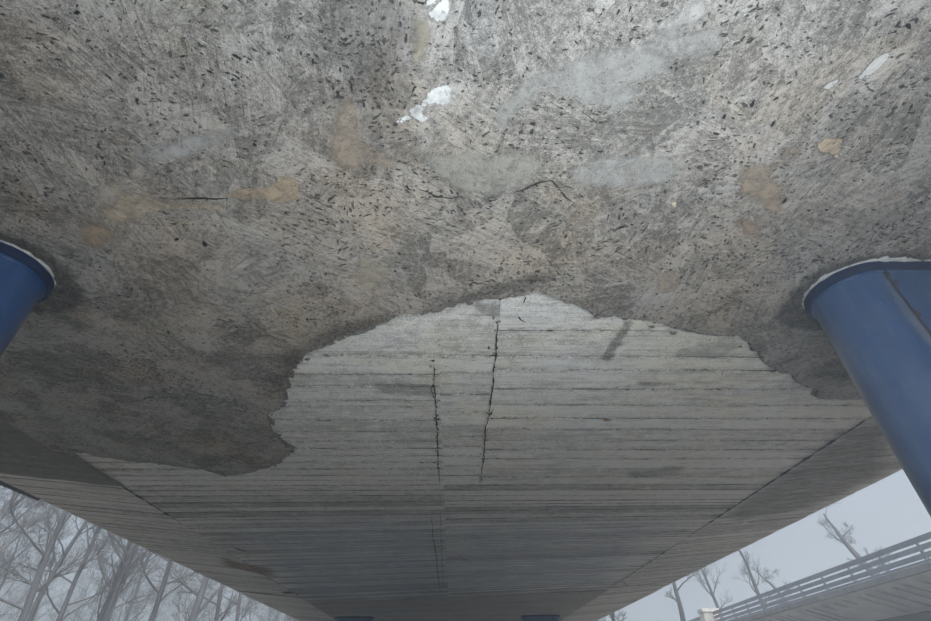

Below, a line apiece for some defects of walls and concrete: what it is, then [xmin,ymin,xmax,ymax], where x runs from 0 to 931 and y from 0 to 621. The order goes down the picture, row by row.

spalling [76,293,872,486]
crack [429,280,544,592]